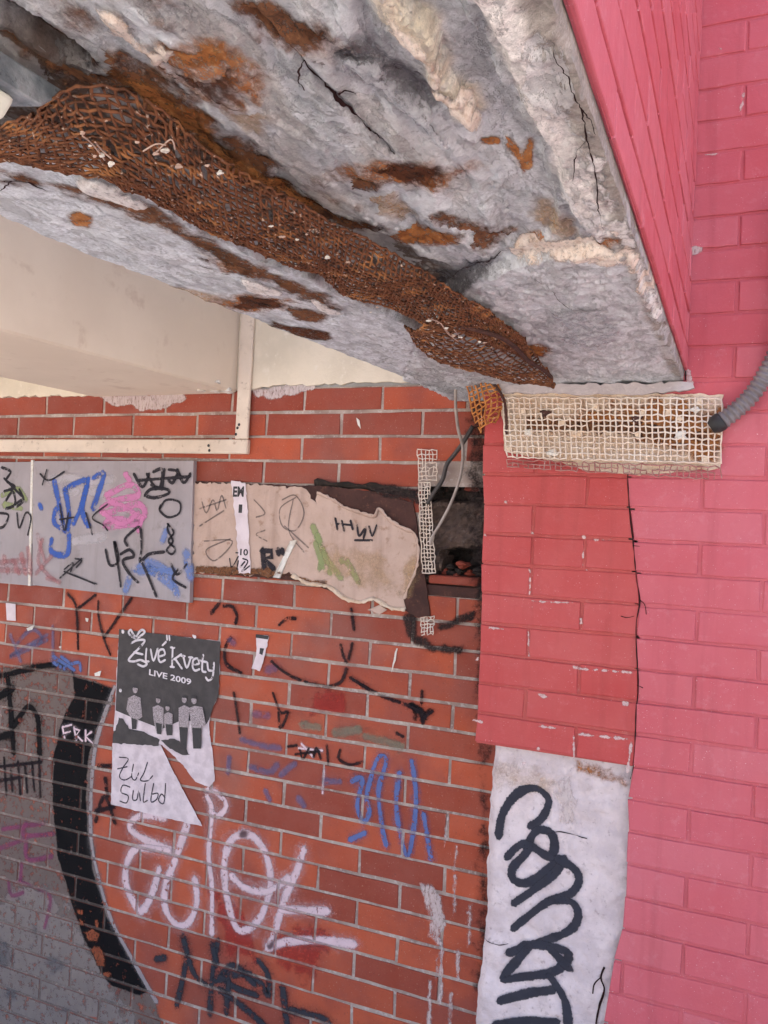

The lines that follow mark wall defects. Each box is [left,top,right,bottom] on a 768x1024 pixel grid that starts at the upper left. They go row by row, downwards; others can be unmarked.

rust [67,8,91,29]
rust [232,0,332,53]
crack [297,53,395,154]
spalling [388,19,481,132]
crack [553,44,604,230]
peeling [76,179,148,210]
rust [0,21,556,433]
peeling [242,279,282,297]
spalling [270,322,331,341]
peeling [311,300,341,315]
peeling [193,478,486,615]
crack [621,474,647,779]